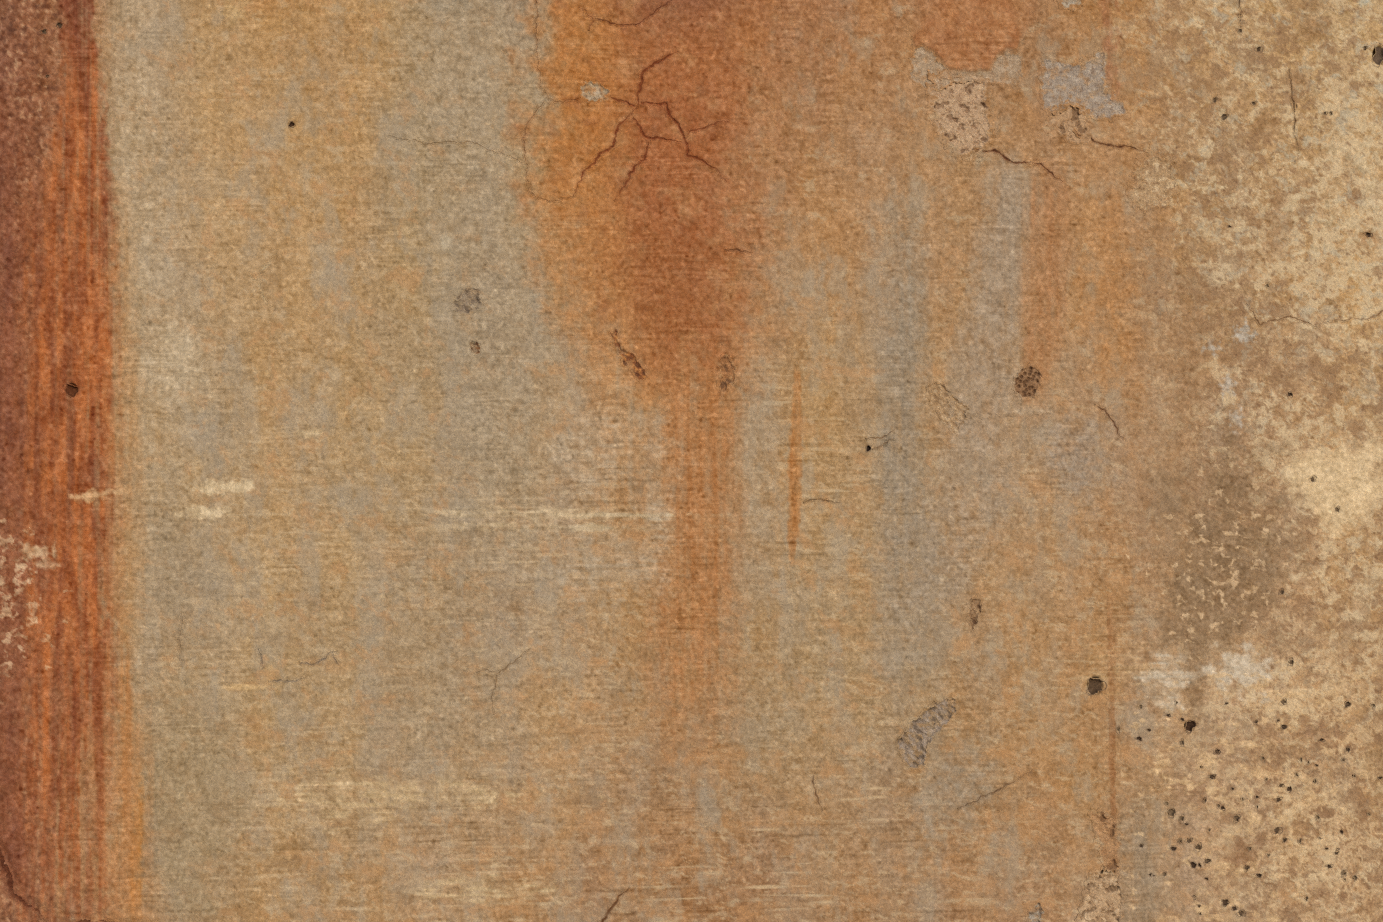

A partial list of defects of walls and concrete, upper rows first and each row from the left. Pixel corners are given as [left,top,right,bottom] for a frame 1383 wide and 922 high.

crack [389,0,730,204]
peeling [901,0,1132,163]
corrosion [0,0,177,922]
corrosion [497,0,872,803]
spalling [896,696,959,771]
crack [0,847,120,922]